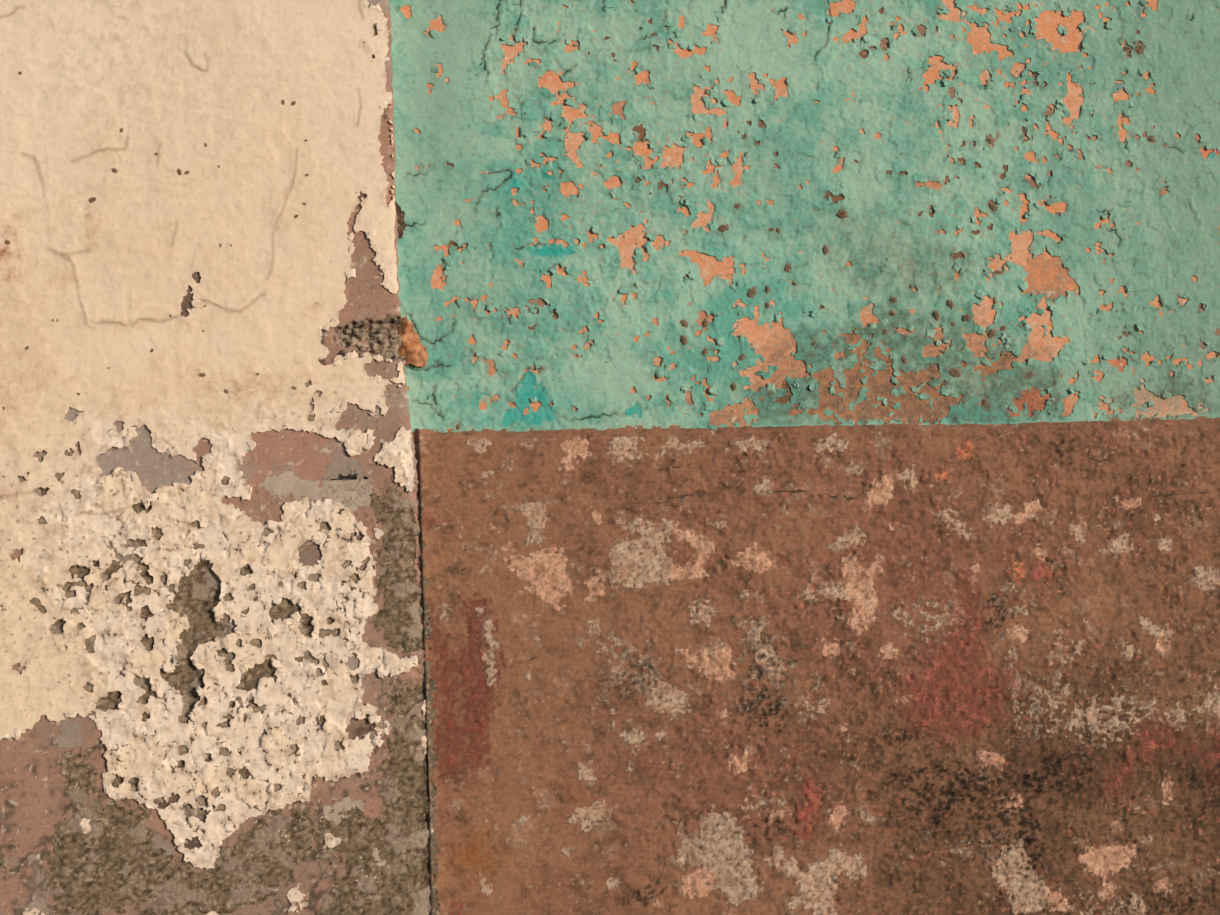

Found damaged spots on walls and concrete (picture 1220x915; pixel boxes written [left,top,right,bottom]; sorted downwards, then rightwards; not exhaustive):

peeling [424,10,447,40]
peeling [426,63,450,95]
peeling [363,0,412,207]
peeling [1195,134,1220,158]
peeling [430,0,1209,427]
peeling [1199,328,1220,360]
peeling [0,191,430,915]